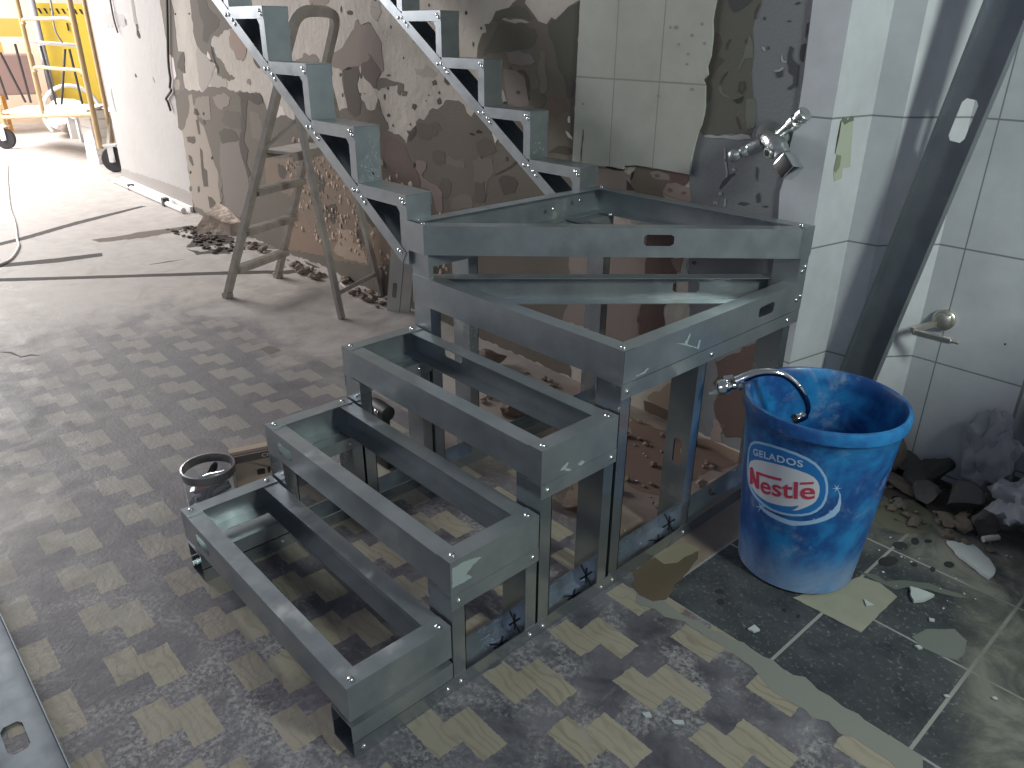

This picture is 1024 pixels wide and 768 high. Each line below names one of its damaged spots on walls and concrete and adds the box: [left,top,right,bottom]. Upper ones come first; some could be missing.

spalling [472,0,580,161]
peeling [700,0,766,136]
spalling [775,23,809,90]
spalling [171,0,397,298]
spalling [339,65,545,215]
spalling [478,256,587,274]
spalling [478,328,571,378]
spalling [518,304,585,327]
peeling [605,304,666,342]